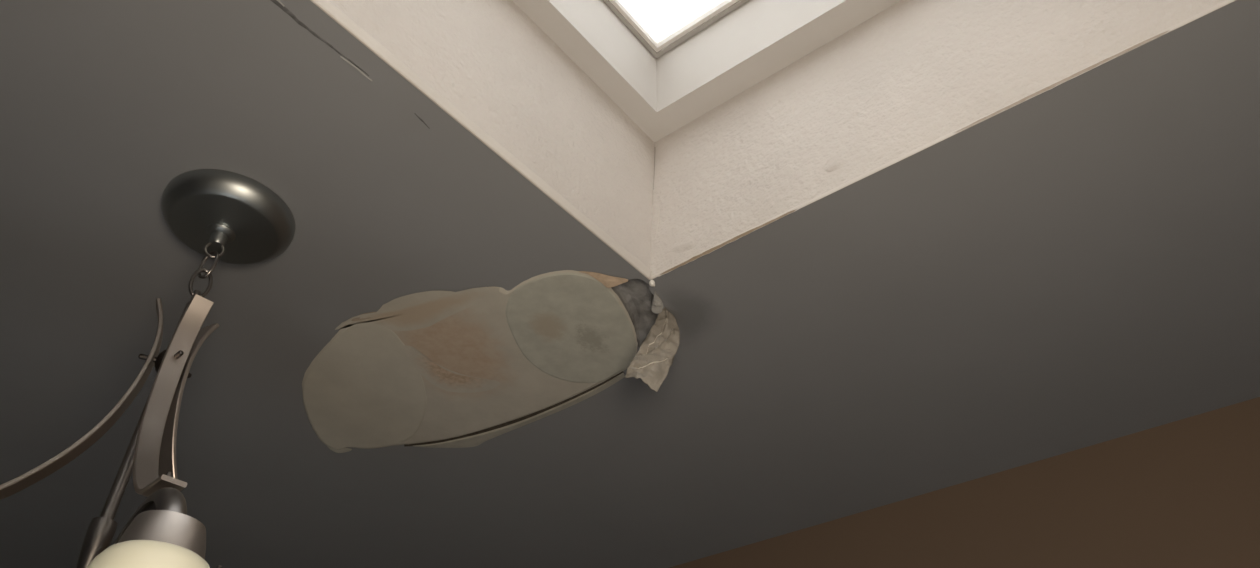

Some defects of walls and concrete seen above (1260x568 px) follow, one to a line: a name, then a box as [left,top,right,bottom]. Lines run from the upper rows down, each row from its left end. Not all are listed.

crack [271,0,372,81]
flaking render [302,270,680,453]